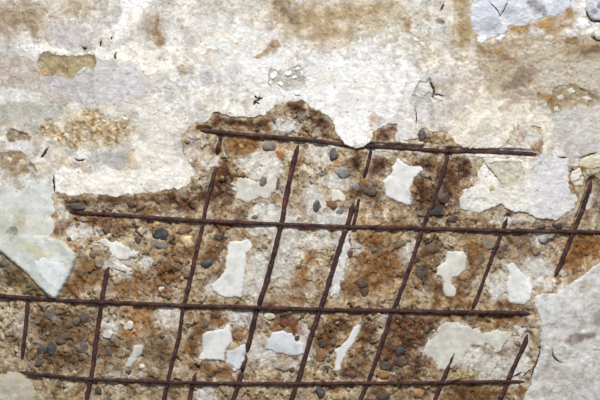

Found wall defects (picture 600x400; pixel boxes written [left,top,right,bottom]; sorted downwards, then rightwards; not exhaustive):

peeling [470,0,572,44]
peeling [37,51,96,79]
rust [65,195,126,207]
rust [144,162,234,212]
rust [371,156,386,173]
rust [414,159,470,211]
rust [203,219,233,260]
spalling [0,100,600,400]
rust [445,300,521,325]
rust [193,364,232,382]
rust [318,318,350,349]
rust [339,319,375,387]